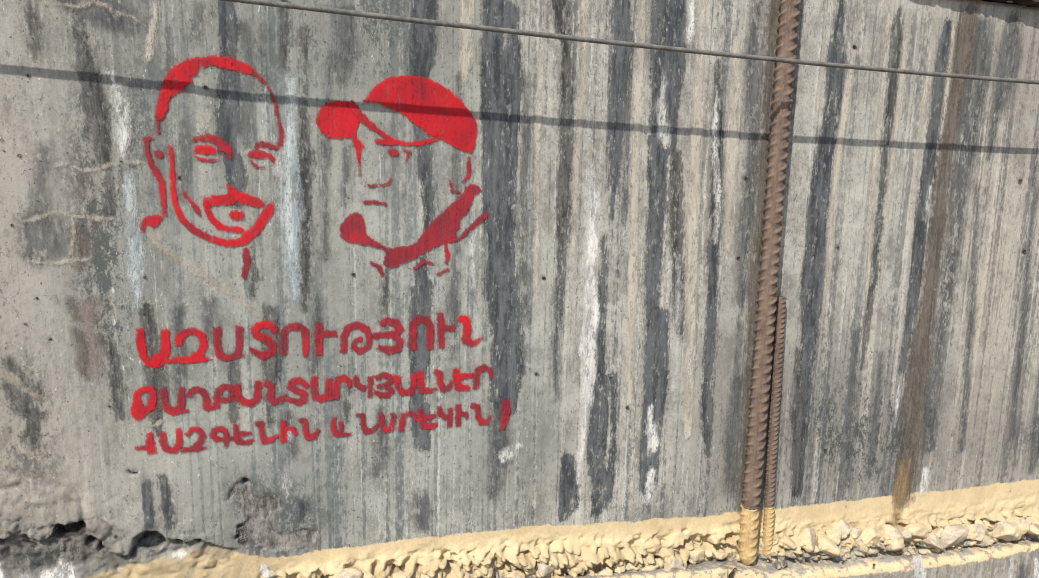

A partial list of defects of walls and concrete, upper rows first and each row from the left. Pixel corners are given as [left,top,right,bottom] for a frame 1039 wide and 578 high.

spalling [51,520,102,545]
spalling [136,531,180,555]
leakage [382,269,390,326]
leakage [447,0,544,499]
leakage [550,0,764,522]
corrosion [735,0,781,511]
leakage [790,0,857,498]
corrosion [893,1,977,528]
leakage [1011,163,1038,438]
leakage [1029,380,1039,473]